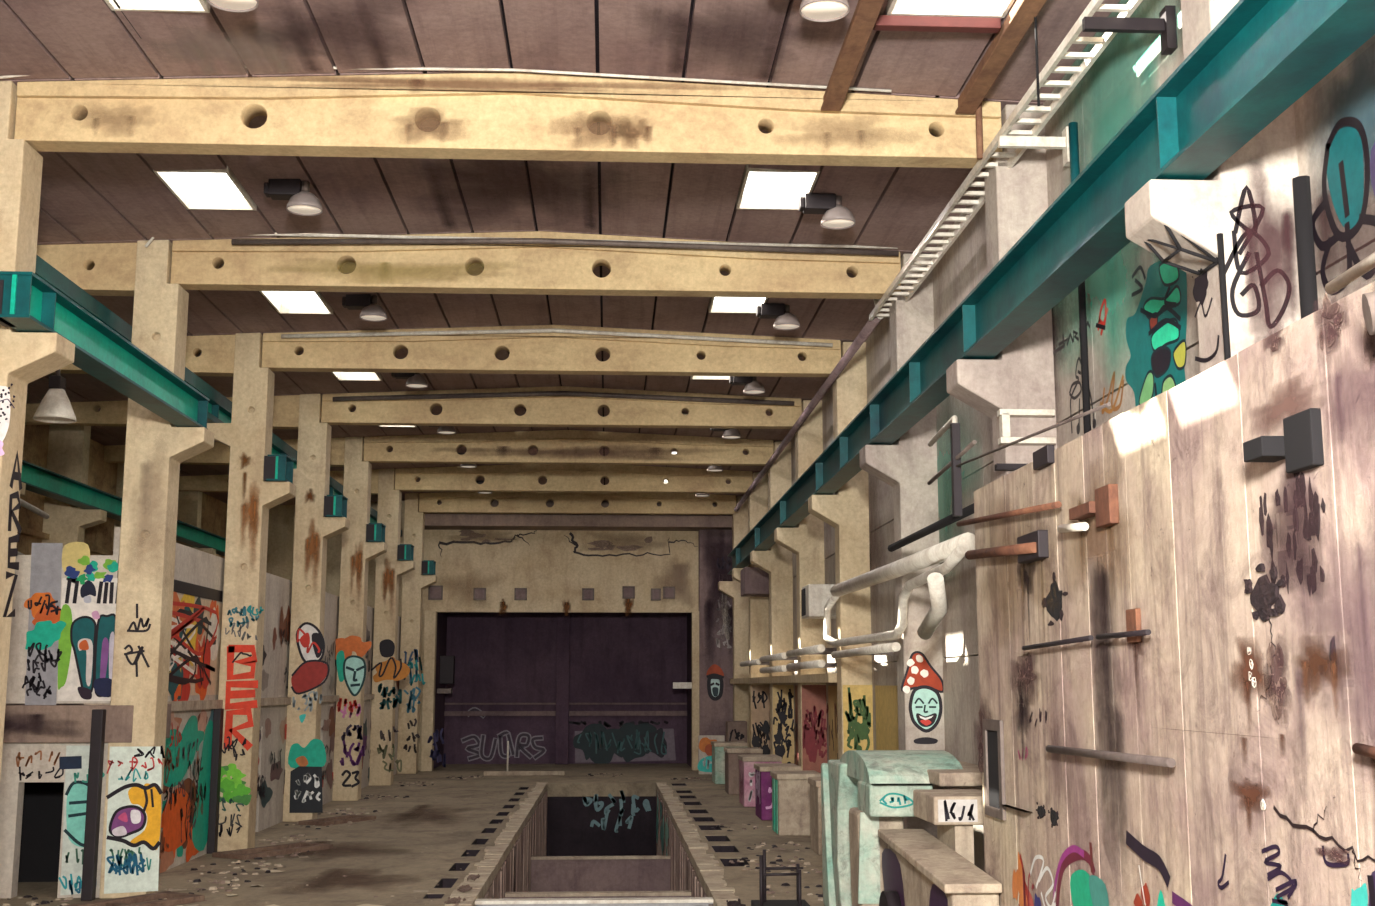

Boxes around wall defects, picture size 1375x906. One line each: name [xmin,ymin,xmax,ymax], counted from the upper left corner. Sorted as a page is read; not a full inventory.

damp [408,114,446,135]
damp [576,121,649,142]
rust [241,454,257,543]
rust [306,524,319,573]
crack [438,530,698,557]
rust [351,549,362,587]
rust [383,564,394,593]
crack [1273,806,1375,880]